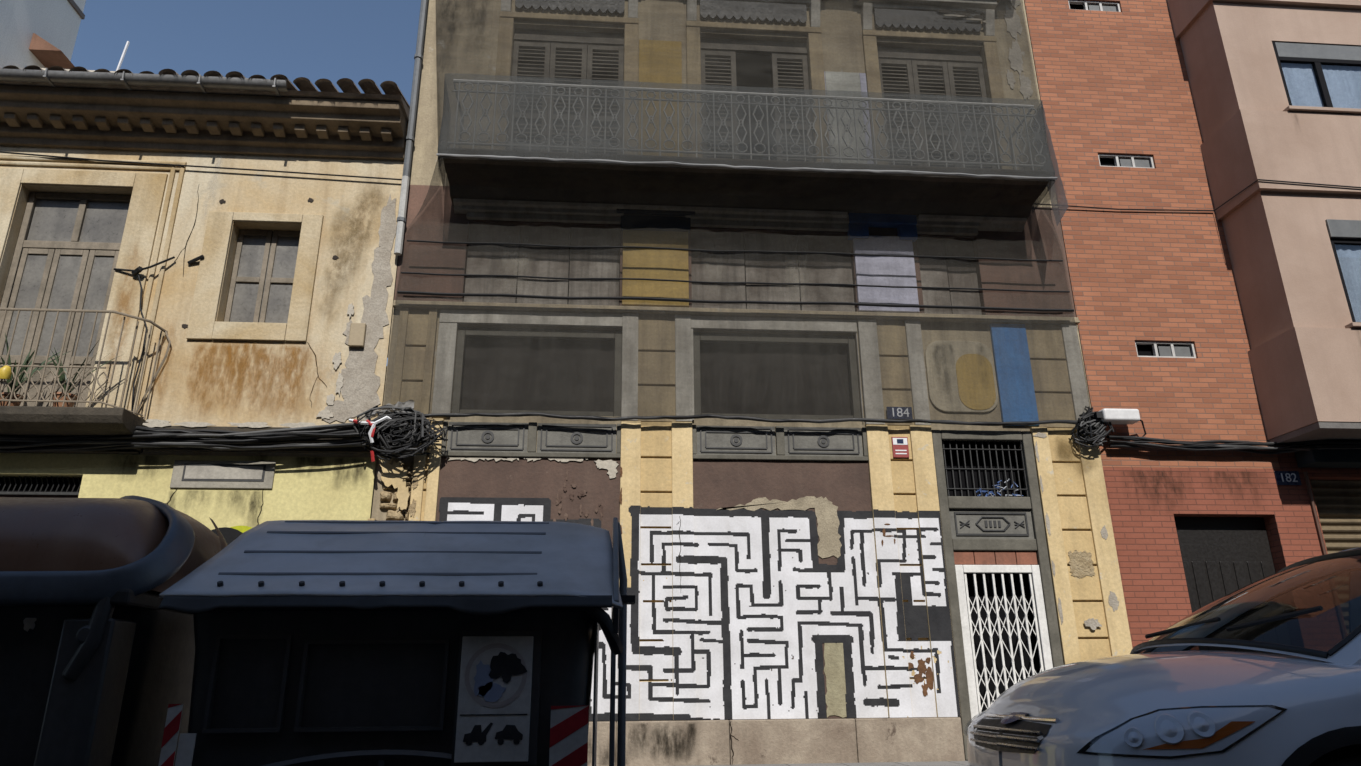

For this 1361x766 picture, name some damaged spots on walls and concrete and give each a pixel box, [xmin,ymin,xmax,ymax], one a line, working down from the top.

peeling [143,194,397,428]
spalling [378,455,418,517]
spalling [446,456,623,505]
spalling [717,496,842,558]